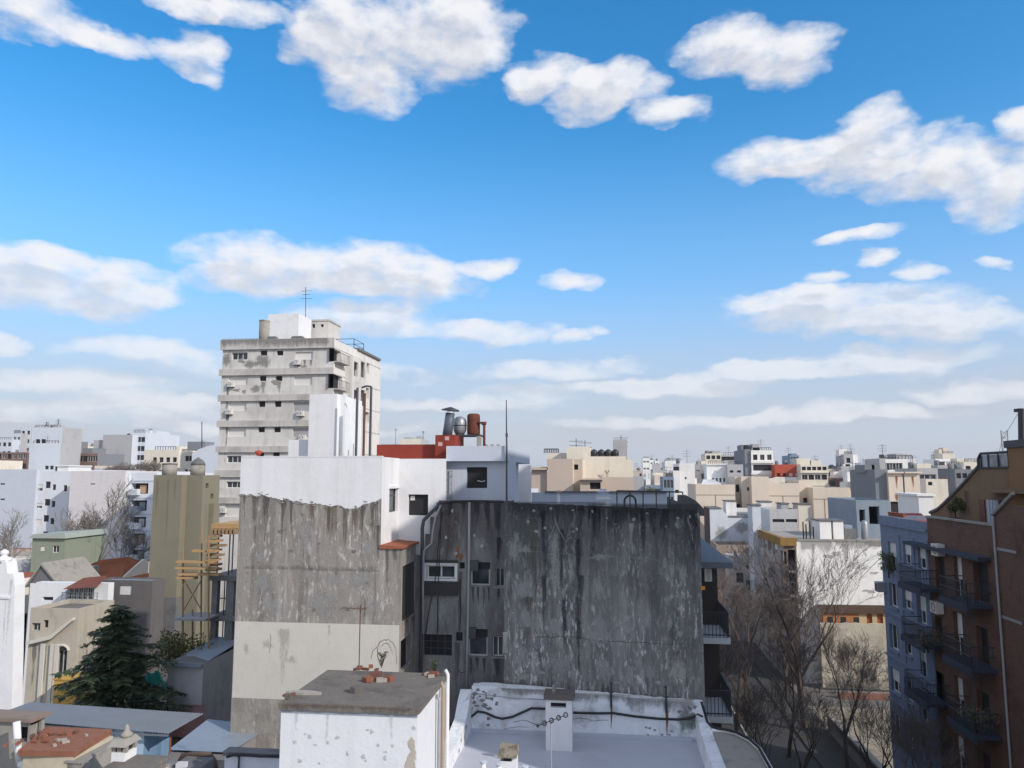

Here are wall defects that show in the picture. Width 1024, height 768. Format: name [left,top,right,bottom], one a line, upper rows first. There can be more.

peeling [239,492,380,516]
damp [448,502,700,678]
spalling [405,726,416,768]